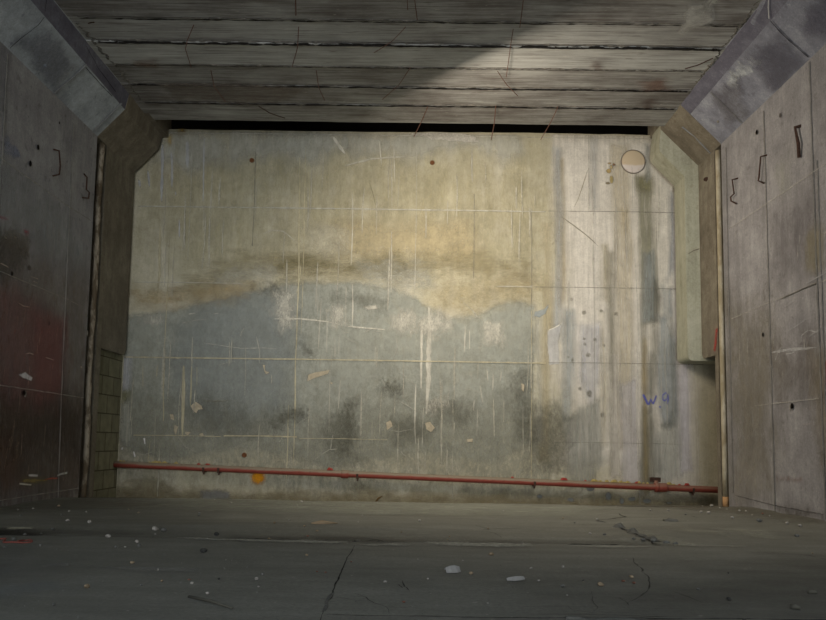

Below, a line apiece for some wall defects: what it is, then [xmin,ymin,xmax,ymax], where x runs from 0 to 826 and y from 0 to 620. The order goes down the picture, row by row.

damp [121,174,560,494]
damp [553,135,697,494]
crack [570,514,704,545]
crack [320,539,409,620]
crack [484,558,753,620]